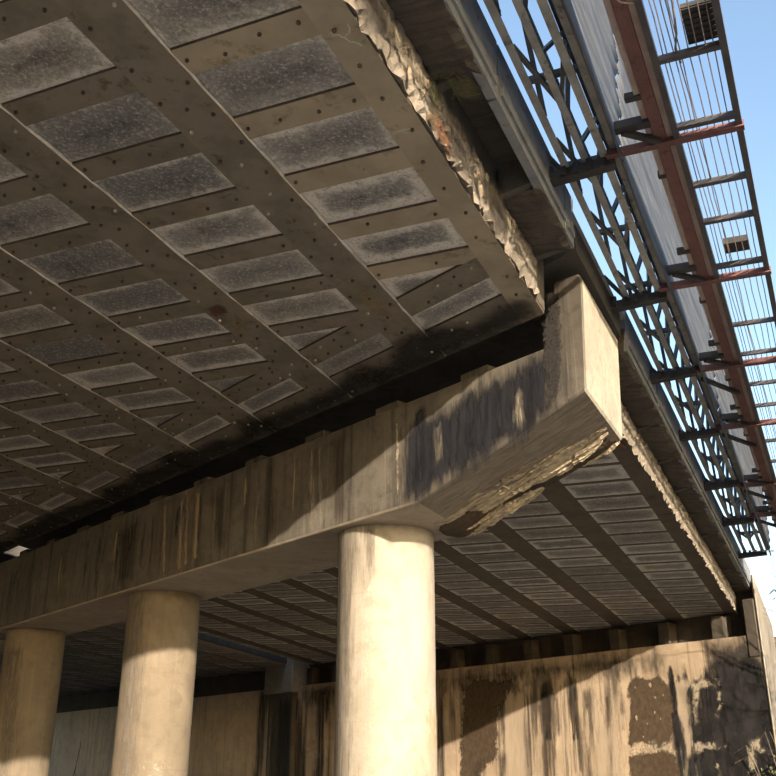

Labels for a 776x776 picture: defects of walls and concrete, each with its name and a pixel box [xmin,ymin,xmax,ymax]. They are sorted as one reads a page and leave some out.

water stain [450,117,475,165]
water stain [0,303,530,554]
water stain [395,291,563,502]
spalling [434,427,626,538]
water stain [309,533,356,776]
water stain [436,678,446,772]
water stain [452,654,657,776]
water stain [630,643,776,776]